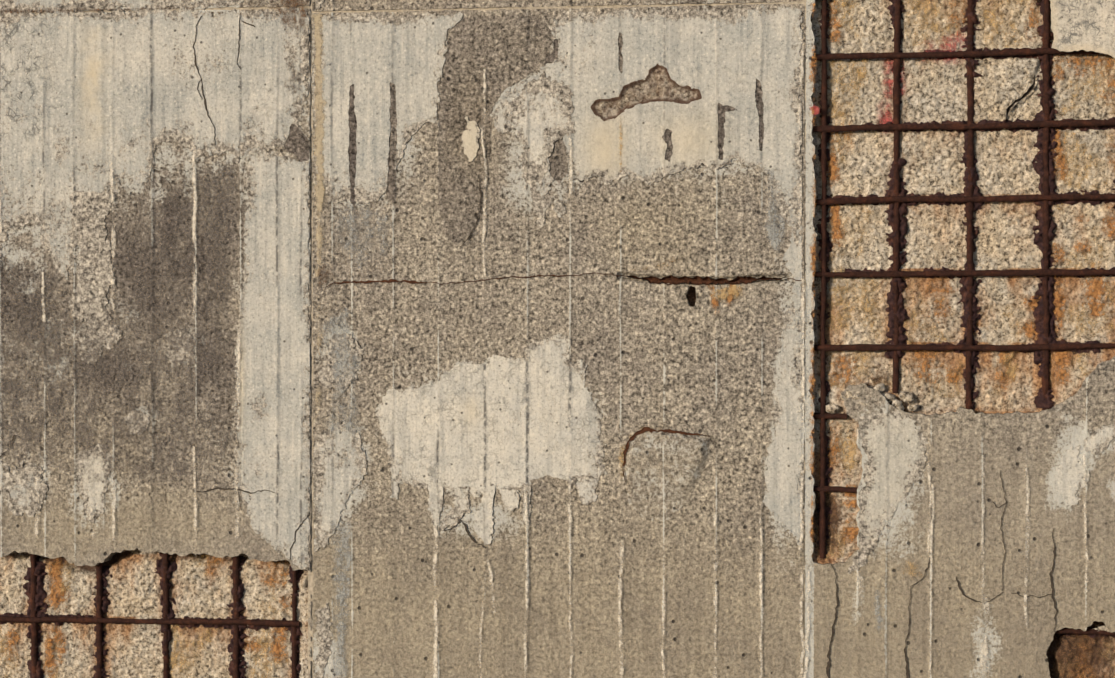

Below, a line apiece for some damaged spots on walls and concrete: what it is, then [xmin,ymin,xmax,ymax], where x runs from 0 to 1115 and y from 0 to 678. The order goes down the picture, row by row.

water stain [0,154,241,530]
peeling [0,0,802,678]
rust [830,205,843,246]
spalling [809,0,1115,574]
rust [1051,351,1071,385]
rust [1017,204,1115,339]
rust [1053,129,1098,191]
crack [826,564,839,678]
rust [810,485,859,555]
crack [904,501,933,678]
crack [956,470,1058,632]
spalling [1046,621,1115,678]